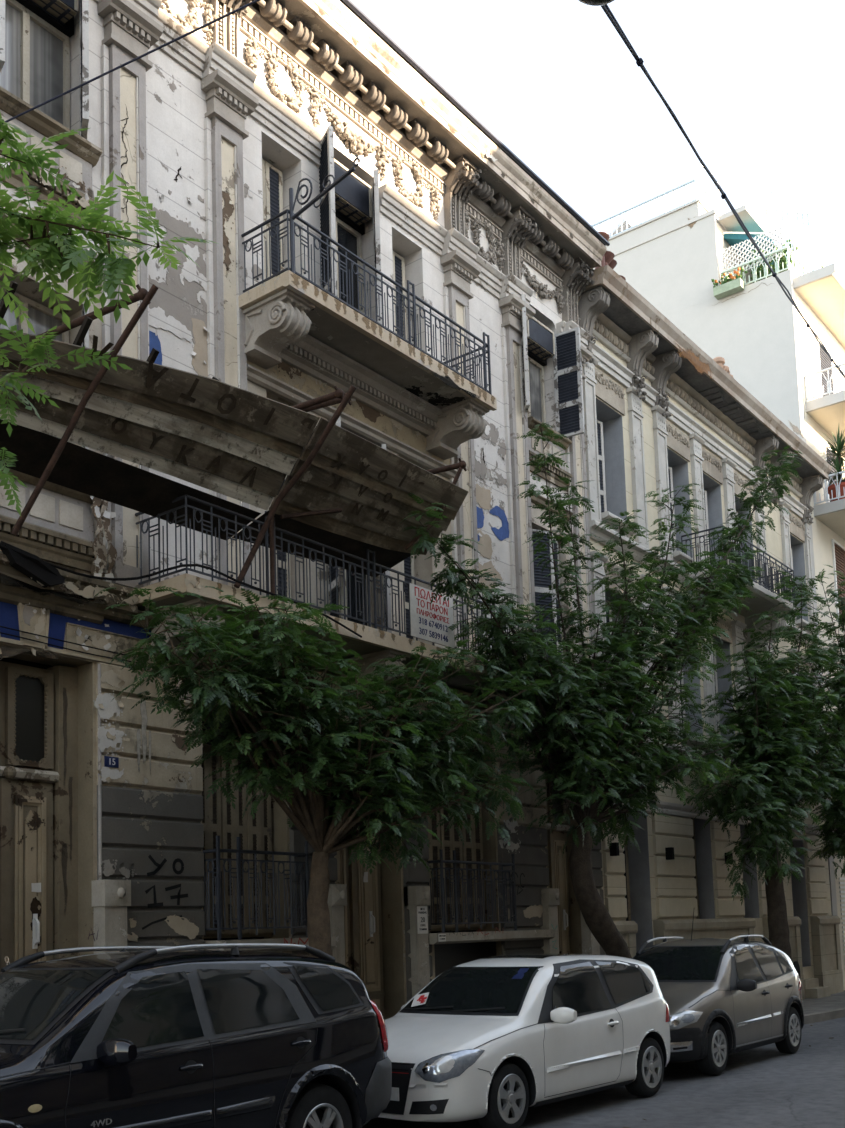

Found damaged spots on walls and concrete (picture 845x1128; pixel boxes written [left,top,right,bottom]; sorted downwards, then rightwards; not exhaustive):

flaking render [31,155,90,208]
crack [120,104,129,231]
peeling [148,190,209,377]
peeling [222,182,262,292]
peeling [405,382,466,406]
peeling [31,496,139,605]
peeling [474,417,509,591]
flaking render [164,914,199,939]